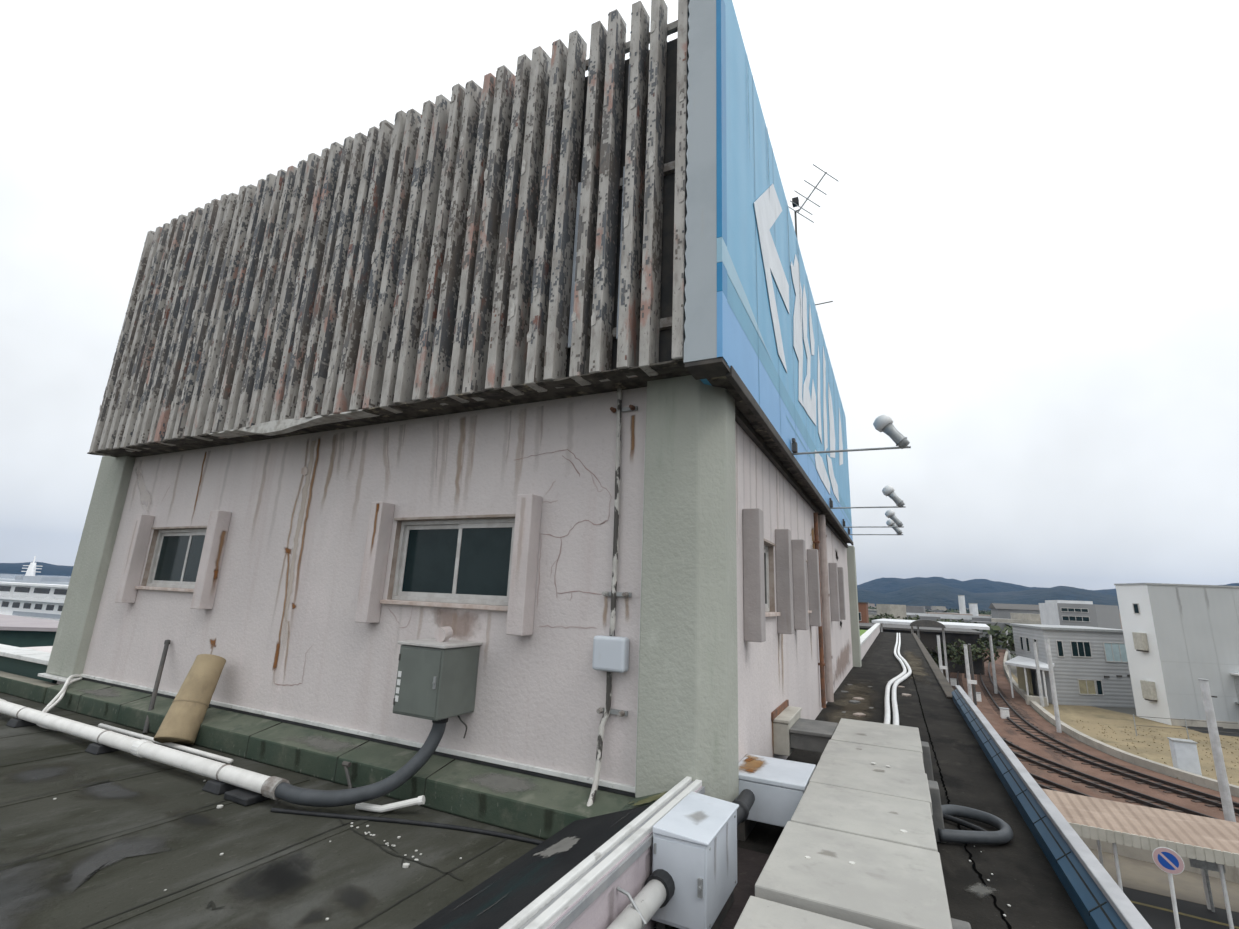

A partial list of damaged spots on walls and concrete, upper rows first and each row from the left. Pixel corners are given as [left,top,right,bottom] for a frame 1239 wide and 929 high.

peeling [97,5,689,448]
rust [273,438,332,668]
crack [516,449,611,629]
crack [912,673,1012,929]